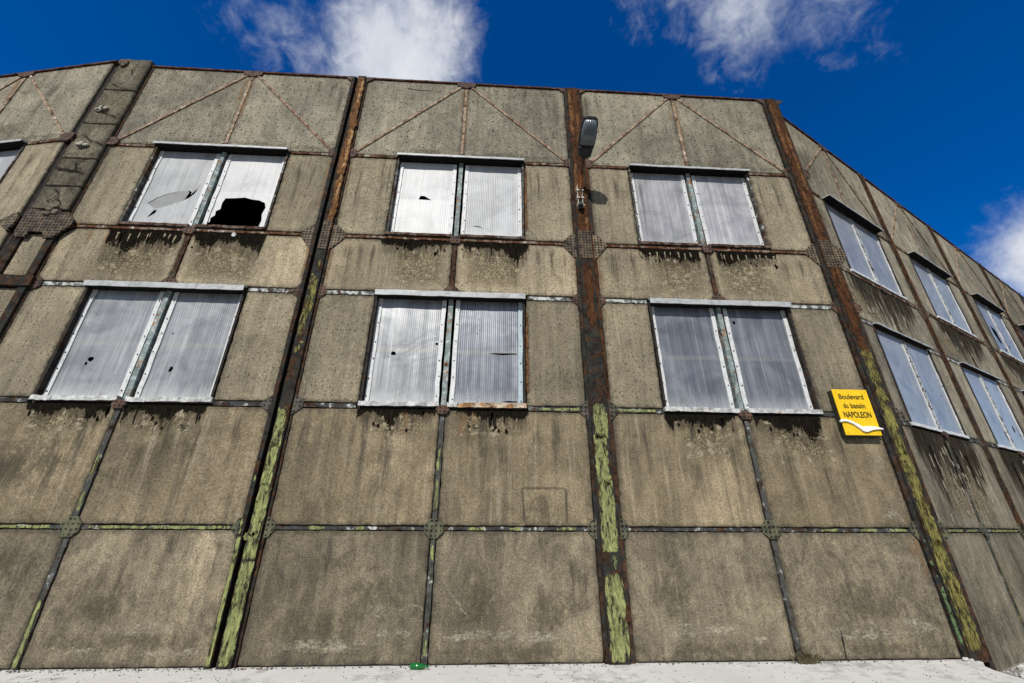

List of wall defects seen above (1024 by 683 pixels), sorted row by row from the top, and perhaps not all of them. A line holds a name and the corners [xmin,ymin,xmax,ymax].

rust [319,77,365,228]
rust [768,100,831,253]
leakage [99,229,267,265]
leakage [370,239,449,263]
leakage [461,242,529,276]
rust [567,89,609,395]
rust [827,265,871,358]
leakage [26,403,207,452]
leakage [456,410,529,446]
leakage [664,414,739,476]
leakage [753,416,823,454]
leakage [909,427,990,506]